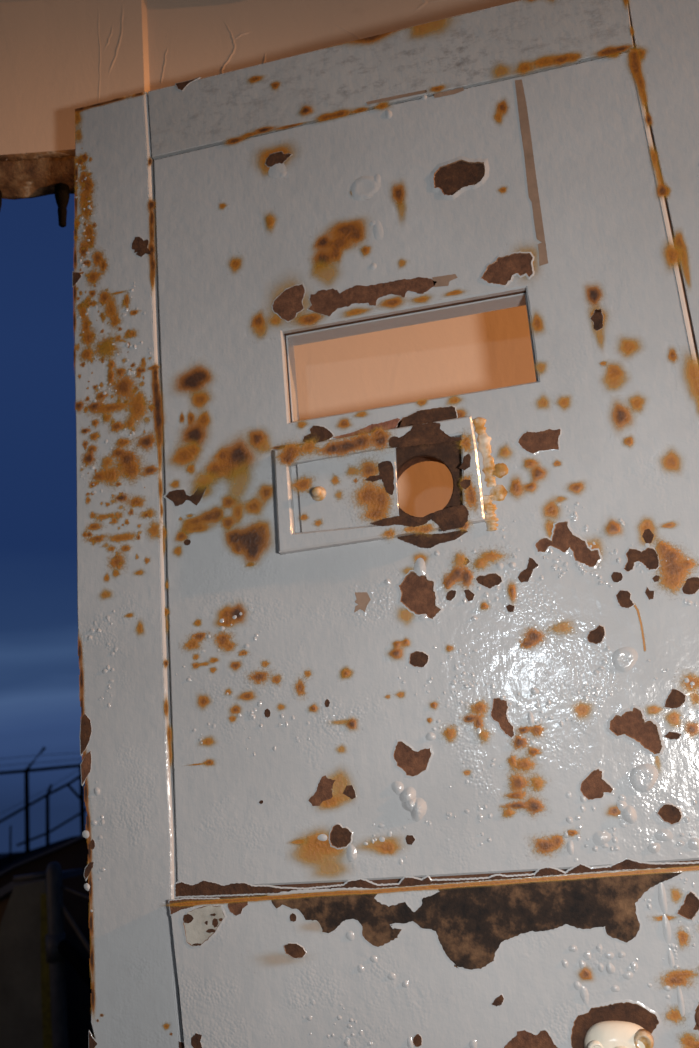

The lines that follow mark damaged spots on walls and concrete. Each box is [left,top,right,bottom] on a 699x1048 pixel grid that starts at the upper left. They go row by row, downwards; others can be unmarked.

corrosion [73,92,434,598]
peeling [302,405,466,448]
peeling [516,519,603,584]
peeling [396,569,503,622]
peeling [606,705,682,768]
corrosion [168,866,699,906]
peeling [168,858,699,972]
corrosion [579,968,592,980]
corrosion [662,970,698,987]
peeling [502,999,662,1048]
corrosion [666,1008,682,1023]
corrosion [680,1033,699,1048]